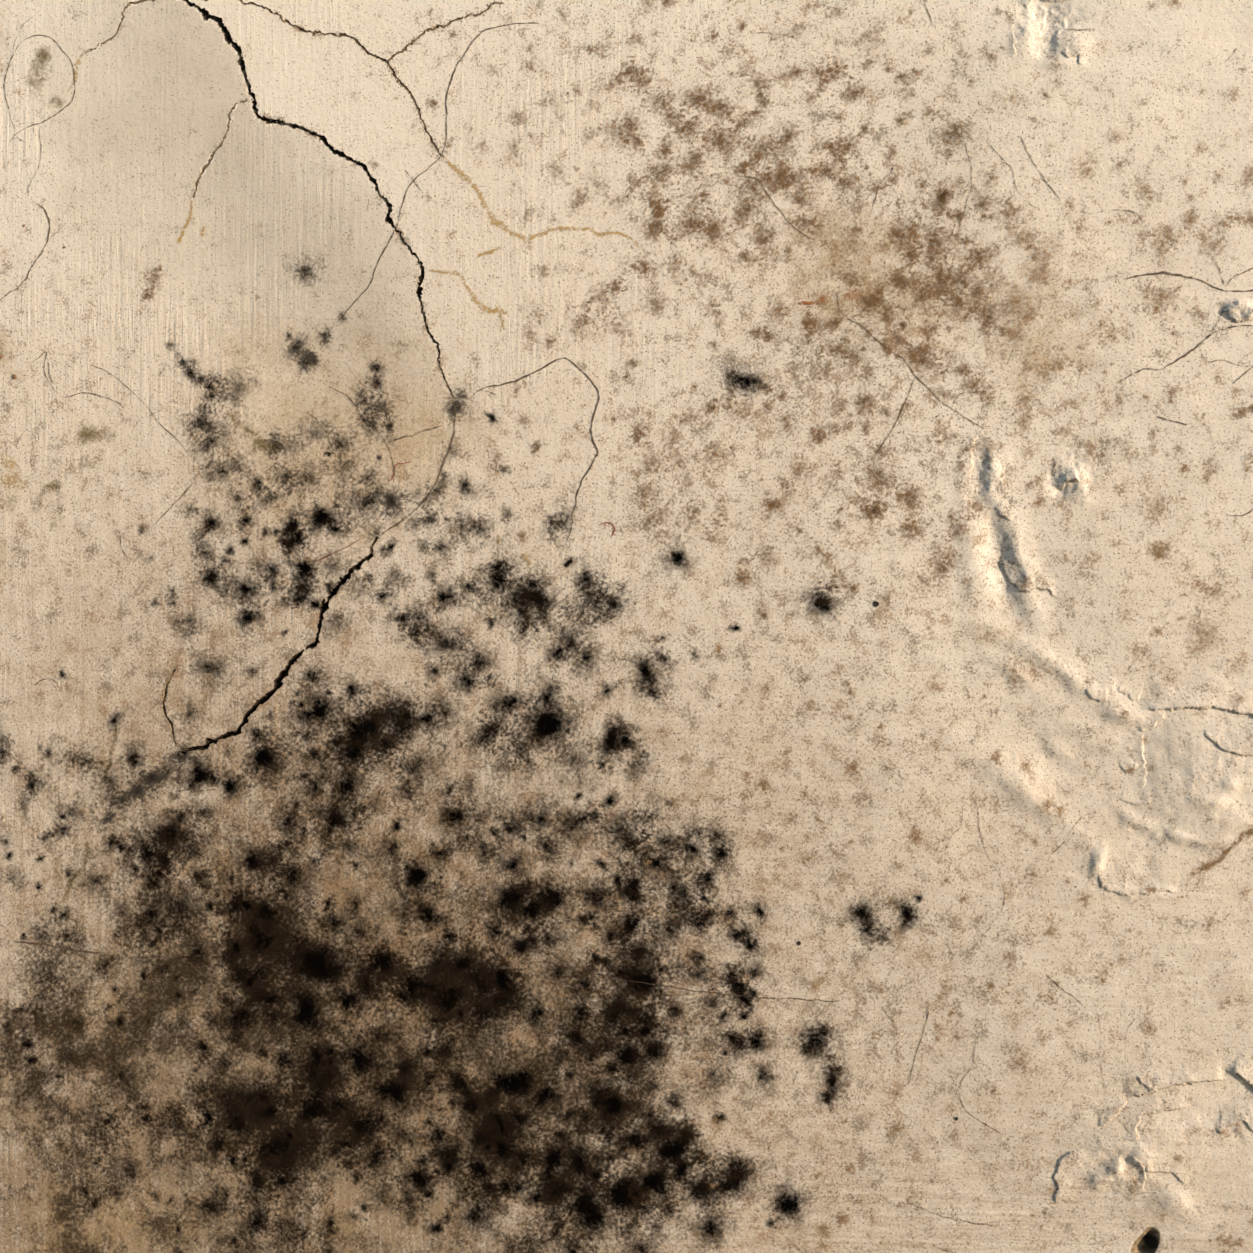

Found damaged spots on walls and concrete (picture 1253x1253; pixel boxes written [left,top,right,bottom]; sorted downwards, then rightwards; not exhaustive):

damp [447,61,873,263]
crack [2,0,600,756]
mould [287,332,331,370]
mould [680,181,1052,429]
damp [168,343,500,630]
mould [803,547,856,615]
mould [834,447,921,537]
damp [0,554,766,1253]
mould [840,903,889,942]
mould [767,1185,804,1226]
mould [799,1025,842,1105]
peeling [1038,1049,1253,1253]